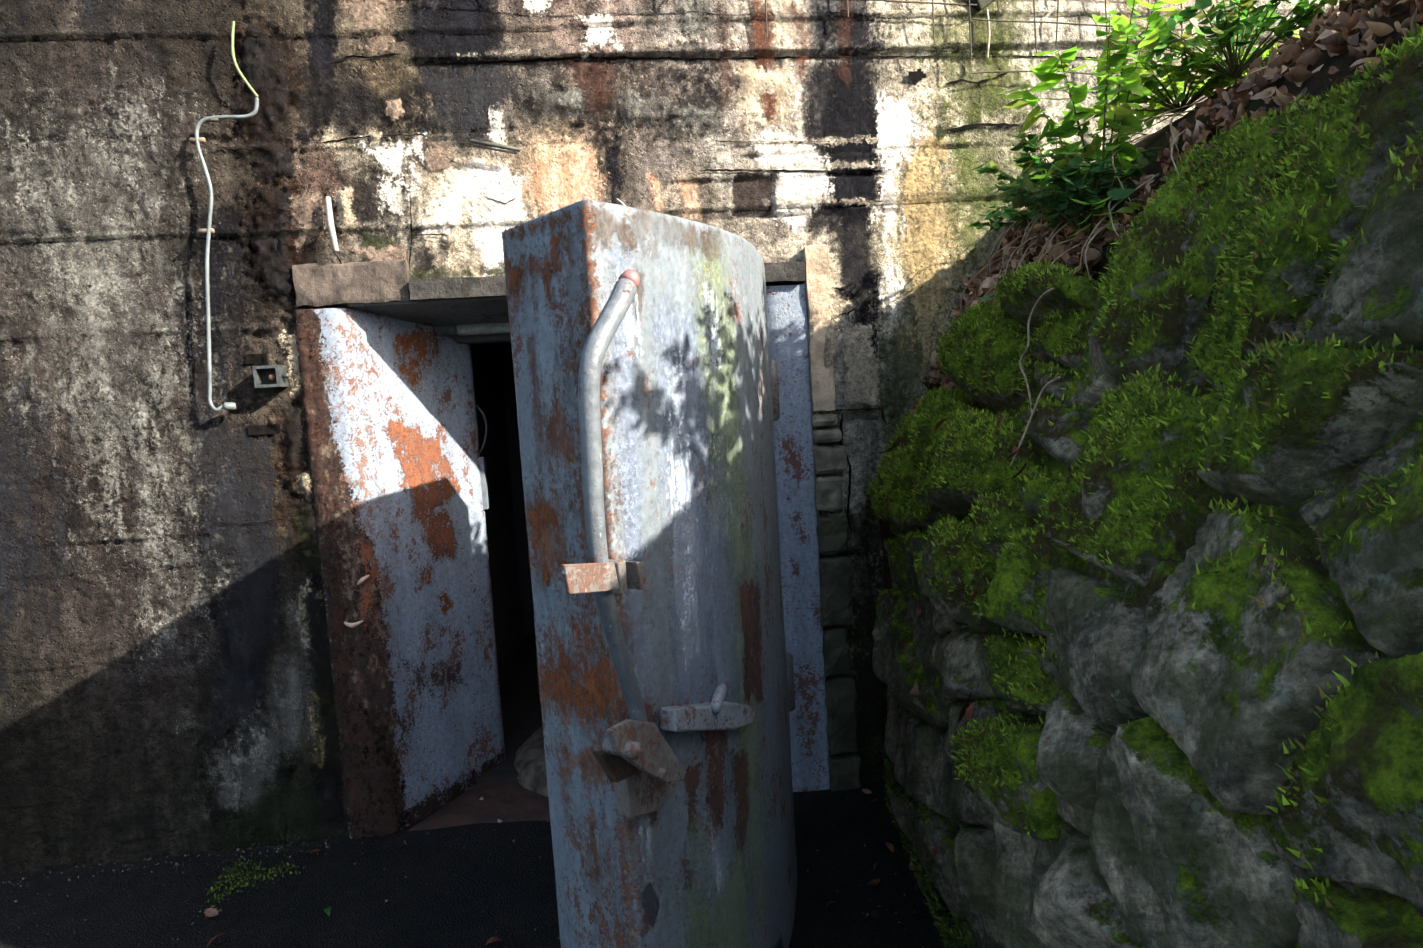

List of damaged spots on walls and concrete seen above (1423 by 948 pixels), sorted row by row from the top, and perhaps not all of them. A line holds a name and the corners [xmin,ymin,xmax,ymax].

water stain [0,0,348,851]
rust [227,17,505,839]
rust [501,199,635,593]
water stain [290,0,965,386]
rust [630,270,643,322]
rust [683,225,721,262]
rust [536,610,661,948]
rust [679,730,751,891]
rust [735,578,764,705]